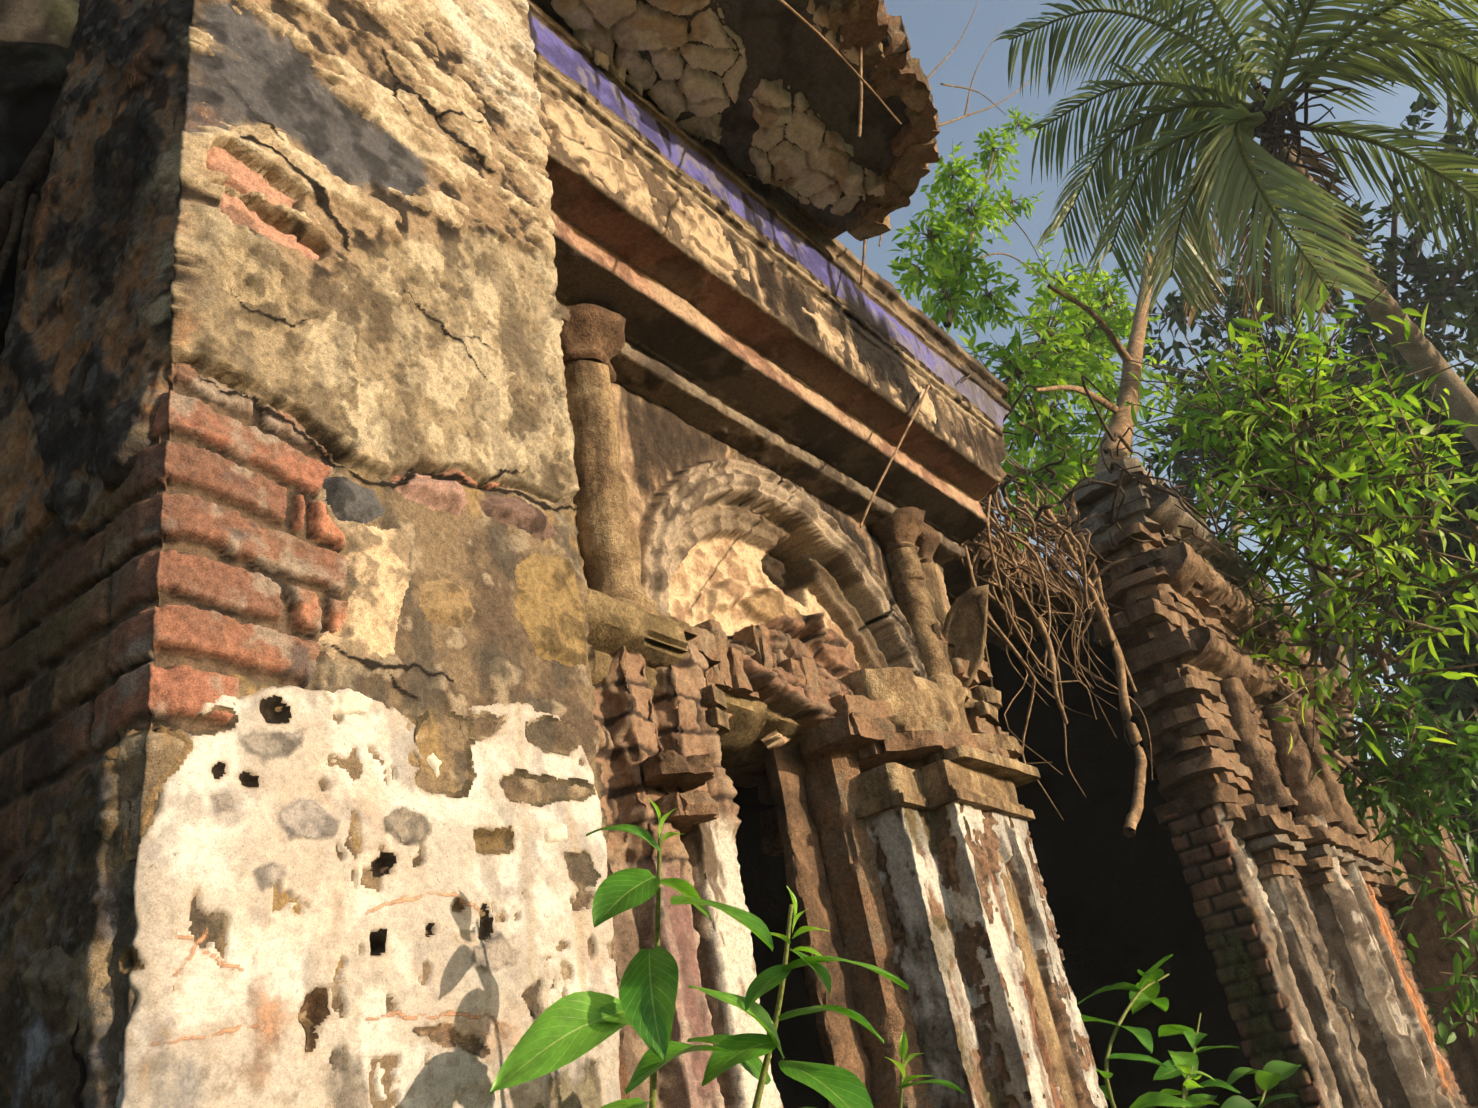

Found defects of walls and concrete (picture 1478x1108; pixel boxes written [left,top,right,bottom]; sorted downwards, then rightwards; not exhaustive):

peeling [182,26,215,56]
peeling [190,0,750,281]
peeling [551,0,885,216]
crack [200,377,579,512]
peeling [0,362,622,1108]
crack [323,644,454,699]
flaking render [921,804,1107,1108]
flaking render [1292,869,1354,1032]
flaking render [1355,1067,1380,1108]